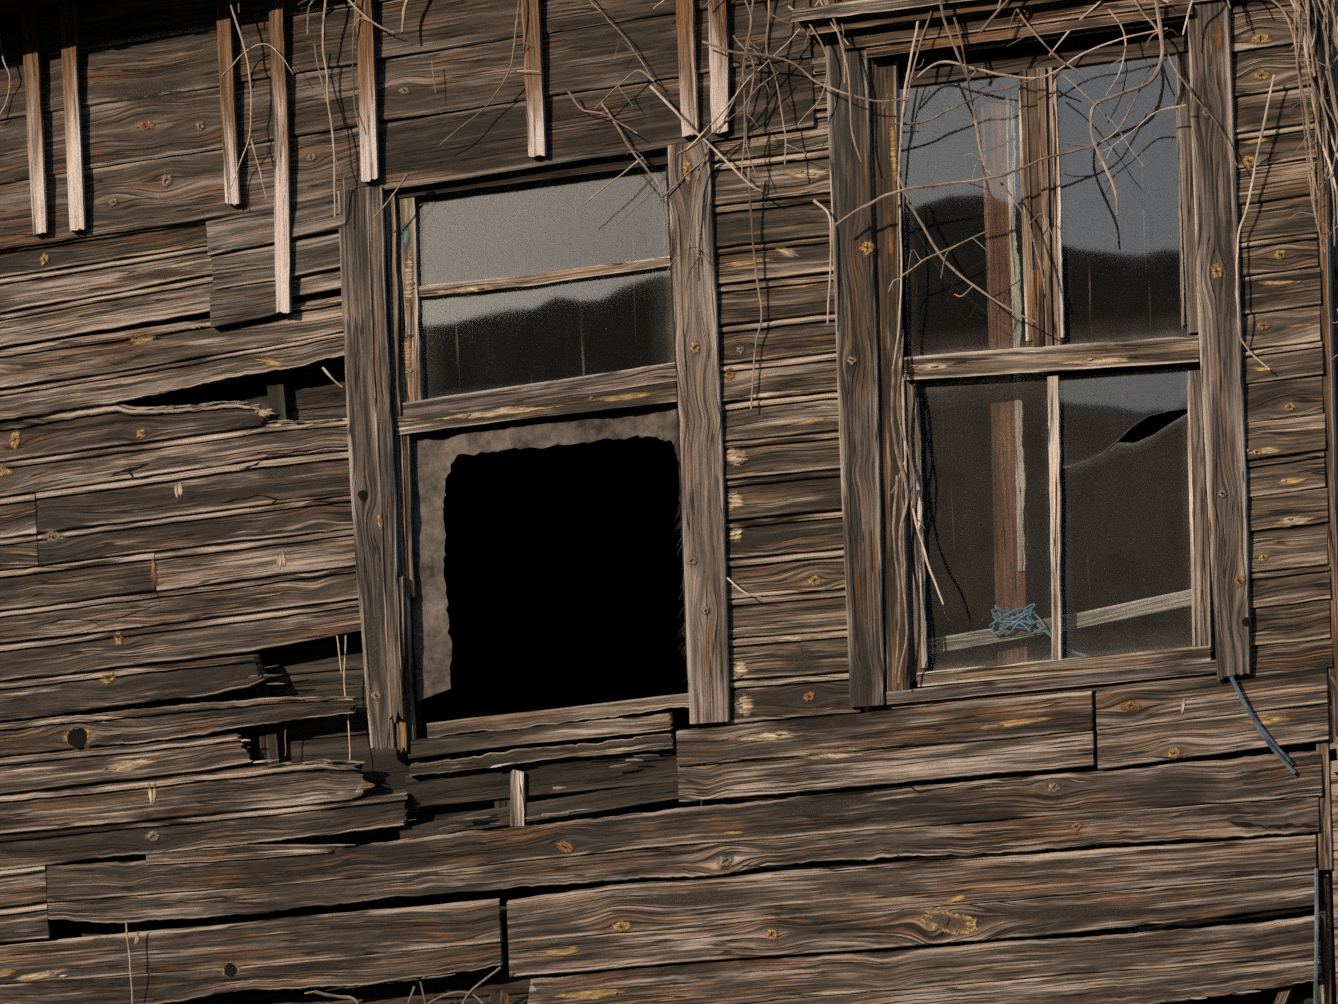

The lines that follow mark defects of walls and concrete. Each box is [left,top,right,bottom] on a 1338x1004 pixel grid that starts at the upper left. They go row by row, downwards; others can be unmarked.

spalling [254,358,289,367]